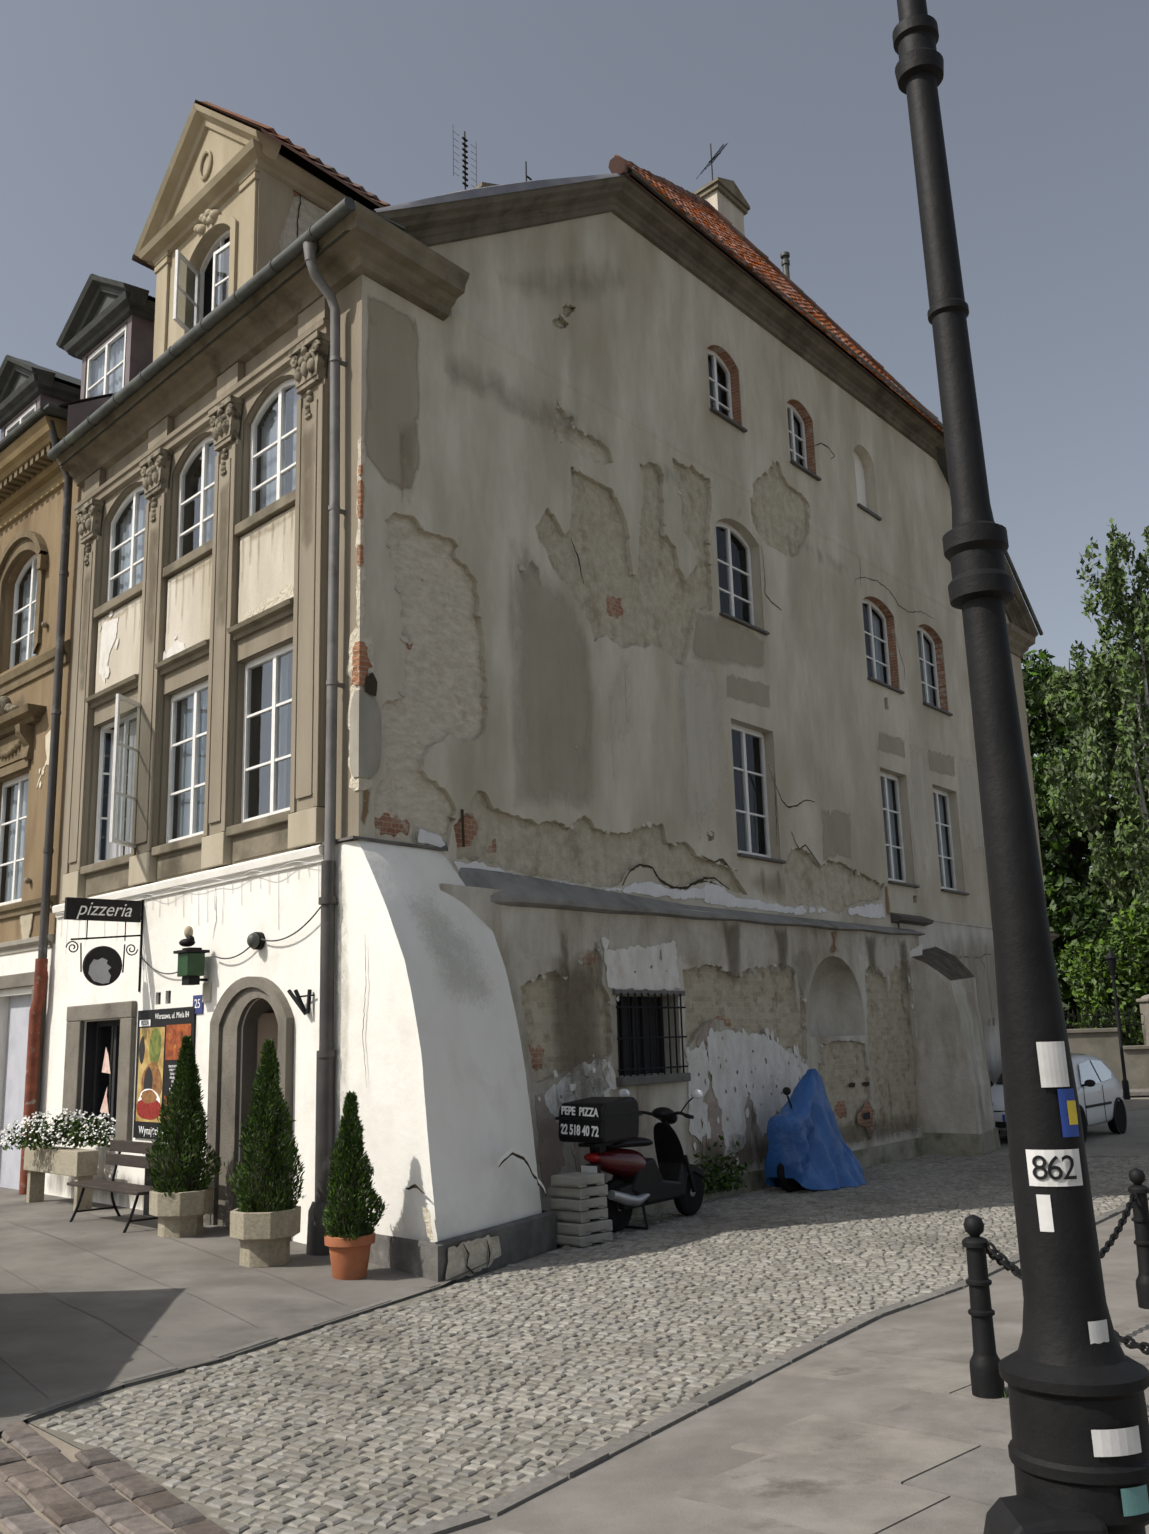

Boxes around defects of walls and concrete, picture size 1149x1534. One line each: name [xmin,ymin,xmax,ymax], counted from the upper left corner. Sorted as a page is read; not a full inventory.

peeling [99,610,119,683]
spalling [346,436,490,845]
spalling [518,462,713,665]
peeling [520,937,876,1196]
peeling [908,943,923,1037]